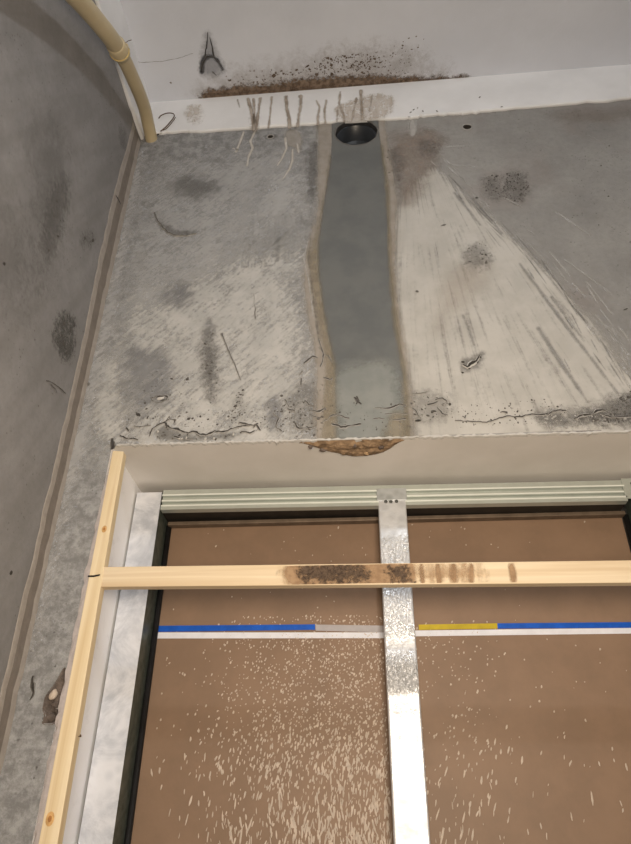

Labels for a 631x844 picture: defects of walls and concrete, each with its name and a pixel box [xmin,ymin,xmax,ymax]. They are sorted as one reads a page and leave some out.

leakage [52,36,631,532]
crack [110,333,631,450]
spalling [116,343,631,456]
spalling [42,668,66,725]